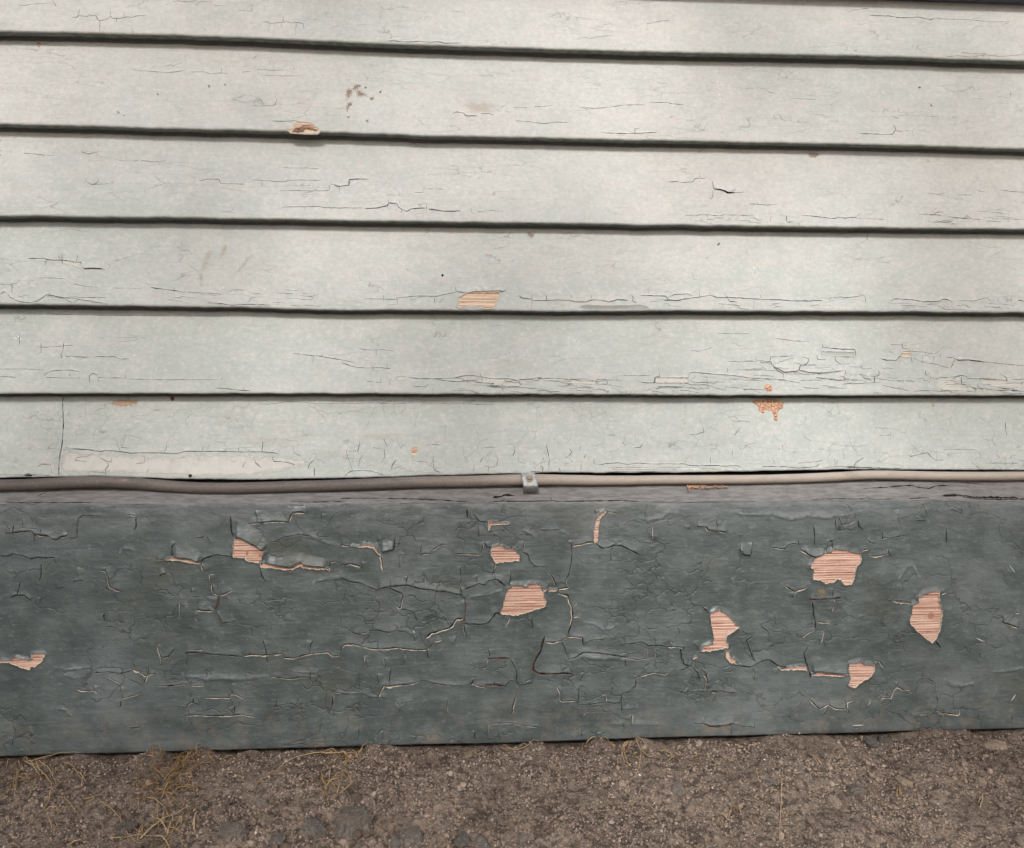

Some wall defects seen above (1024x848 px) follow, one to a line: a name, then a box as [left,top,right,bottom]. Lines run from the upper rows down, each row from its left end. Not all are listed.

crack [200,166,503,213]
crack [668,175,883,224]
crack [0,276,321,307]
peeling [364,287,506,310]
crack [519,274,1024,371]
crack [0,334,495,405]
peeling [156,516,401,582]
peeling [464,504,641,645]
peeling [785,534,868,597]
crack [77,538,756,735]
peeling [677,604,886,691]
peeling [888,585,947,649]